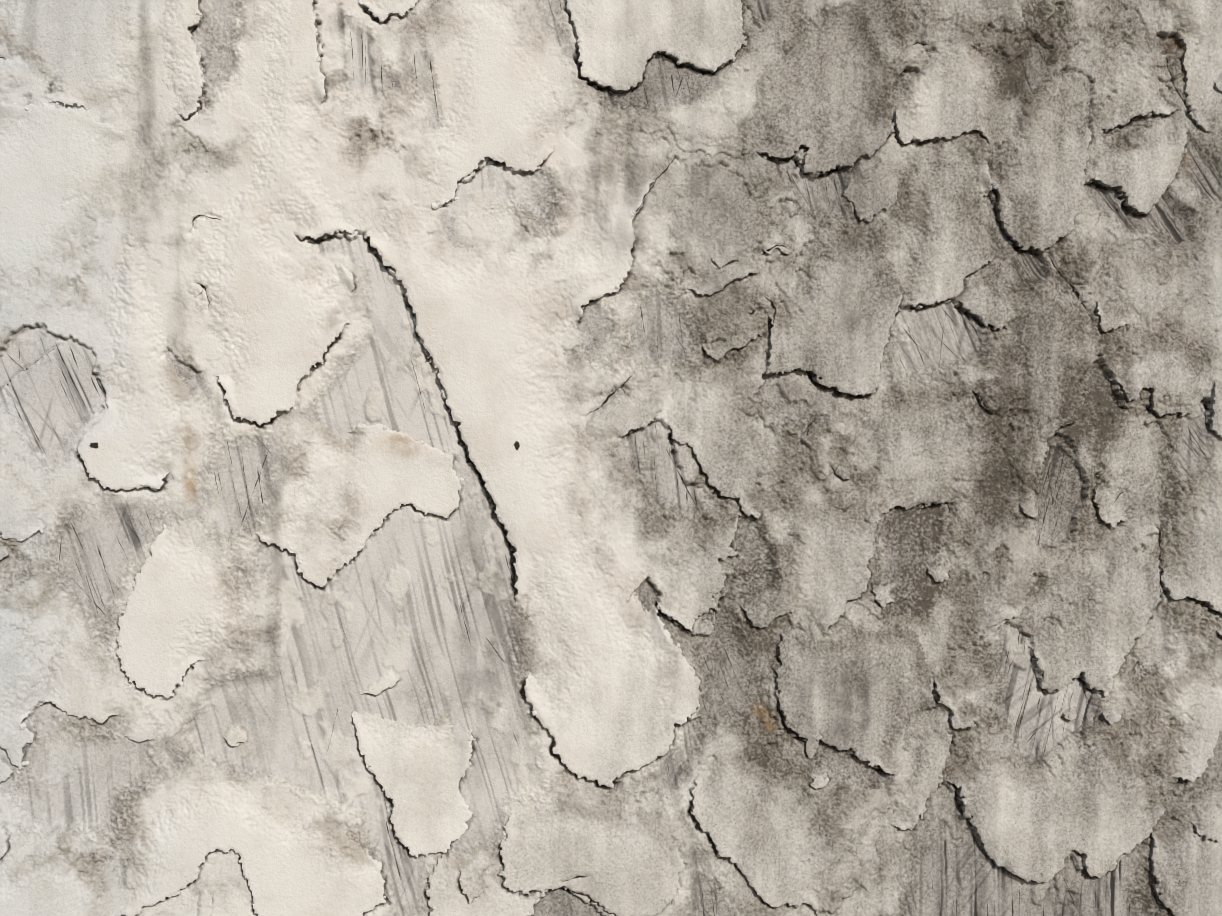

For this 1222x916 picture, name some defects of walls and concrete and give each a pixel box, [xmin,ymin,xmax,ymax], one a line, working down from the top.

peeling [0,0,143,109]
peeling [667,160,794,296]
peeling [745,0,1029,224]
peeling [754,31,1222,548]
peeling [1157,0,1222,133]
peeling [0,234,282,699]
spalling [110,0,766,916]
spalling [0,611,191,849]
peeling [585,341,1222,916]
peeling [0,828,104,916]